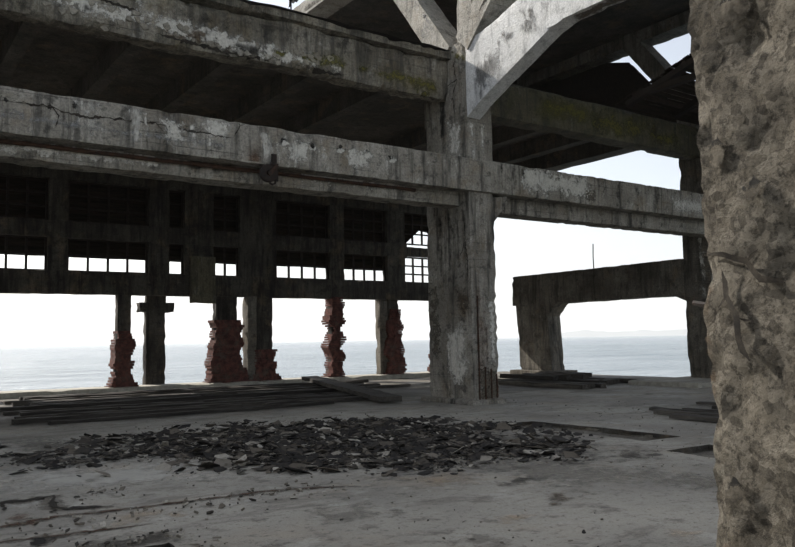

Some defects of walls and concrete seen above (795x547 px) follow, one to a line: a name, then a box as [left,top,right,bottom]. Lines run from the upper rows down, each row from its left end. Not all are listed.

peeling [41,0,341,71]
crack [6,99,245,143]
spalling [455,285,499,400]
crack [0,483,360,543]